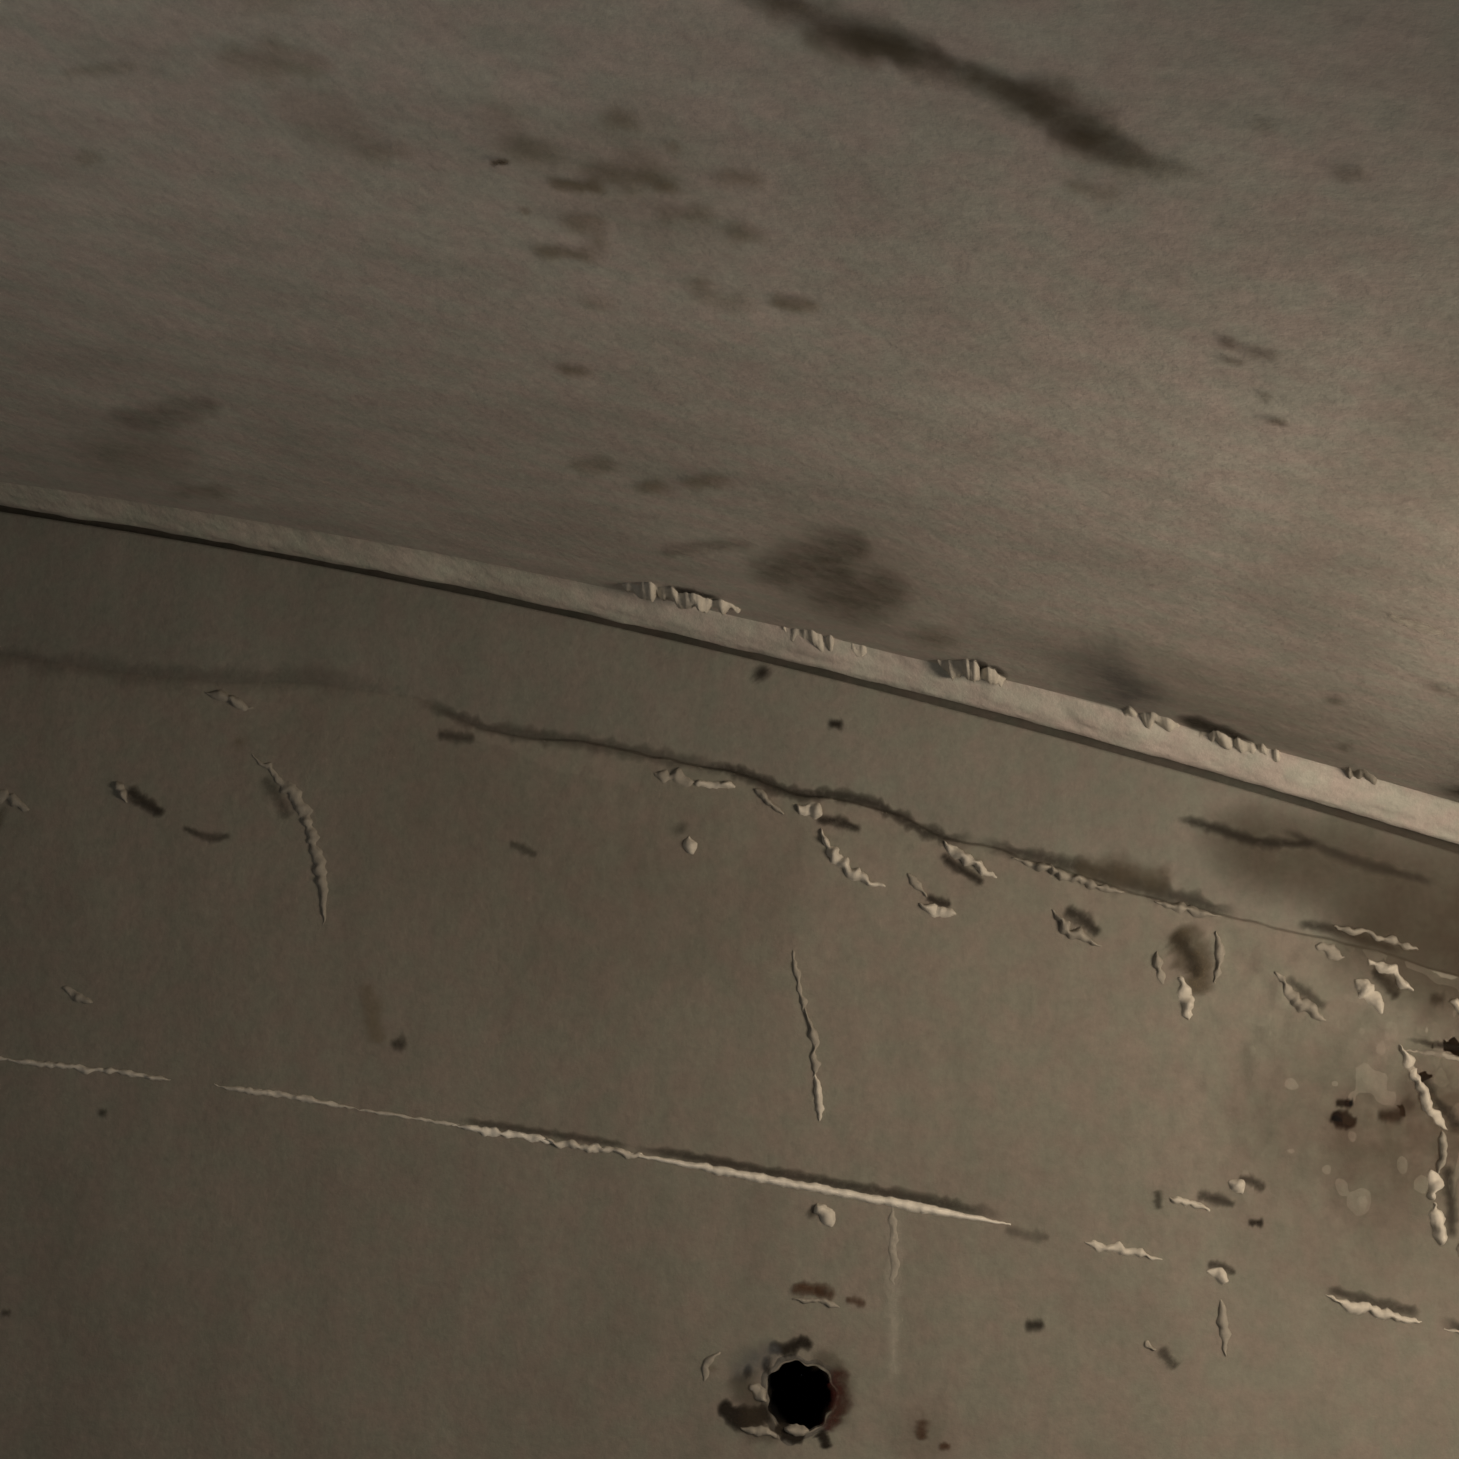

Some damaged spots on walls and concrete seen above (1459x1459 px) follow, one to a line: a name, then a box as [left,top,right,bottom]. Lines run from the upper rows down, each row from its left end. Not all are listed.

water stain [818,24,913,64]
flaking render [654,767,997,887]
flaking render [907,873,956,918]
spalling [1152,901,1225,1020]
flaking render [1308,924,1419,1014]
crack [792,950,825,1121]
crack [214,1084,1011,1308]
spalling [1158,1178,1264,1212]
spalling [1331,1100,1356,1129]
crack [1398,1043,1459,1257]
crack [1085,1240,1162,1260]
crack [1326,1295,1459,1333]